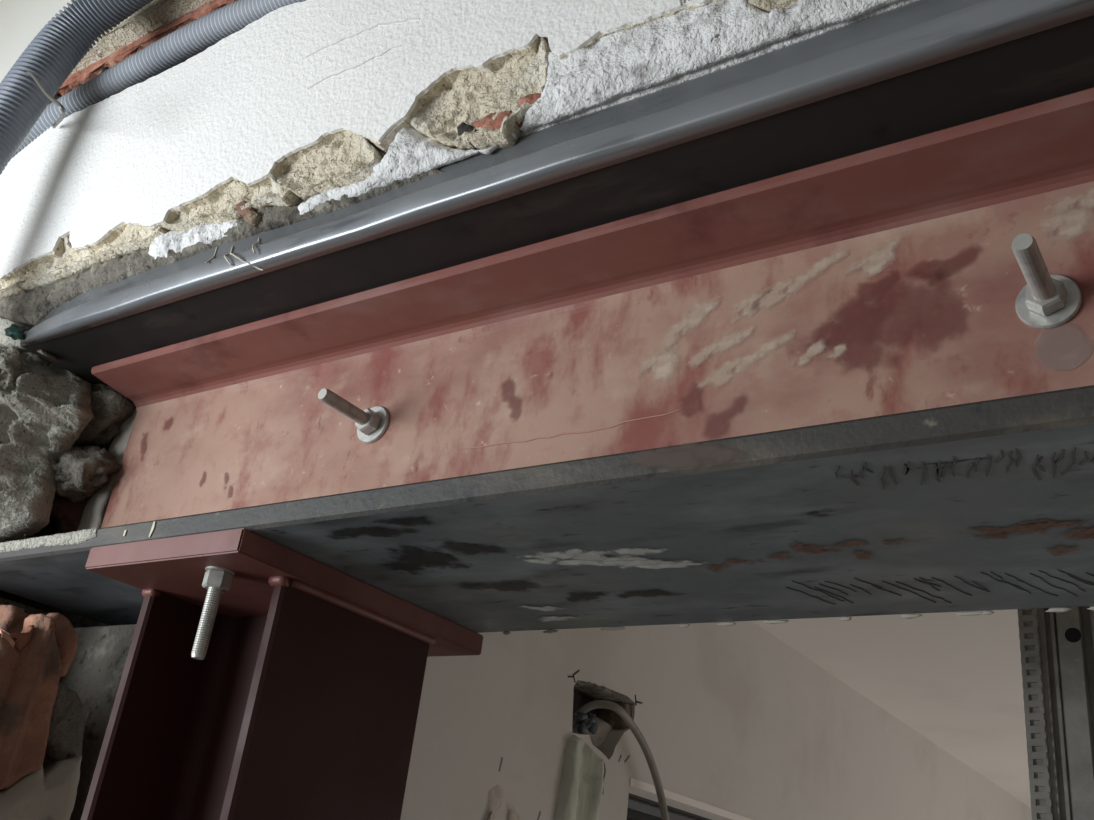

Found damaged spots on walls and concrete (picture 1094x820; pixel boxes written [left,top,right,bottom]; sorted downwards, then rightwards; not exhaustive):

flaking render [748,0,798,14]
crack [304,19,419,89]
flaking render [409,37,552,150]
flaking render [0,131,383,300]
corrosion [970,519,1094,556]